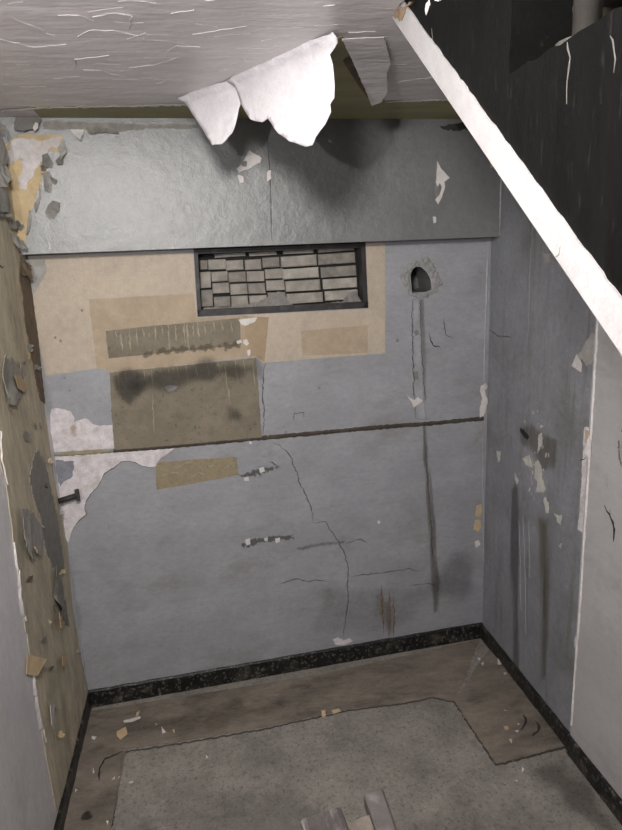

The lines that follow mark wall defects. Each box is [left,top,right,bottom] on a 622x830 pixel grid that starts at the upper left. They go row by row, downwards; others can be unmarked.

crack [0,0,246,84]
peeling [0,32,468,812]
crack [54,363,484,637]
damp [406,299,426,428]
damp [424,441,435,579]
peeling [474,504,482,548]
peeling [473,383,488,449]
peeling [515,420,562,525]